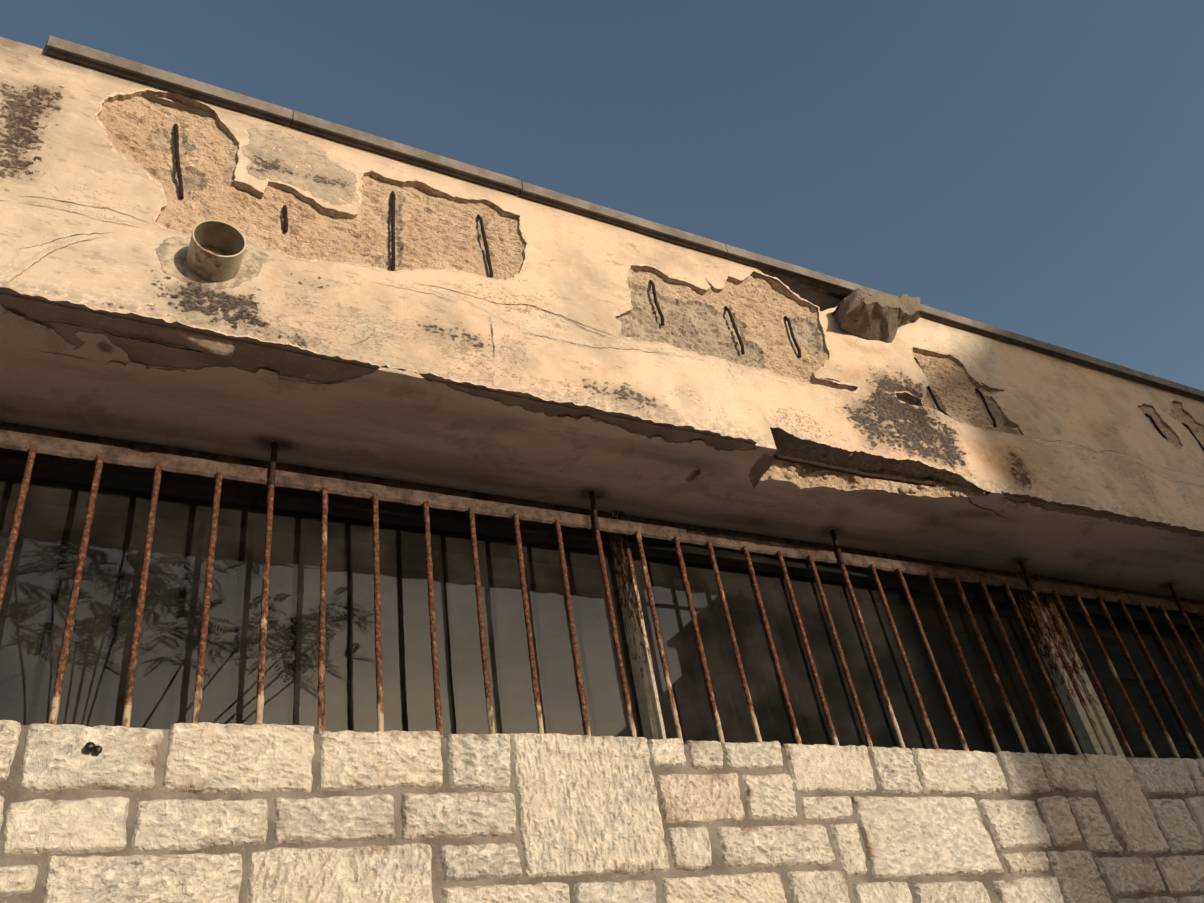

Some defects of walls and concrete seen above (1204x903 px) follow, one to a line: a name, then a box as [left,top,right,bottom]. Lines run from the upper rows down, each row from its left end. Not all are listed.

leakage [0,81,65,191]
spalling [95,88,529,281]
leakage [142,270,321,349]
spalling [614,263,920,393]
peeling [0,286,1204,537]
leakage [844,365,975,478]